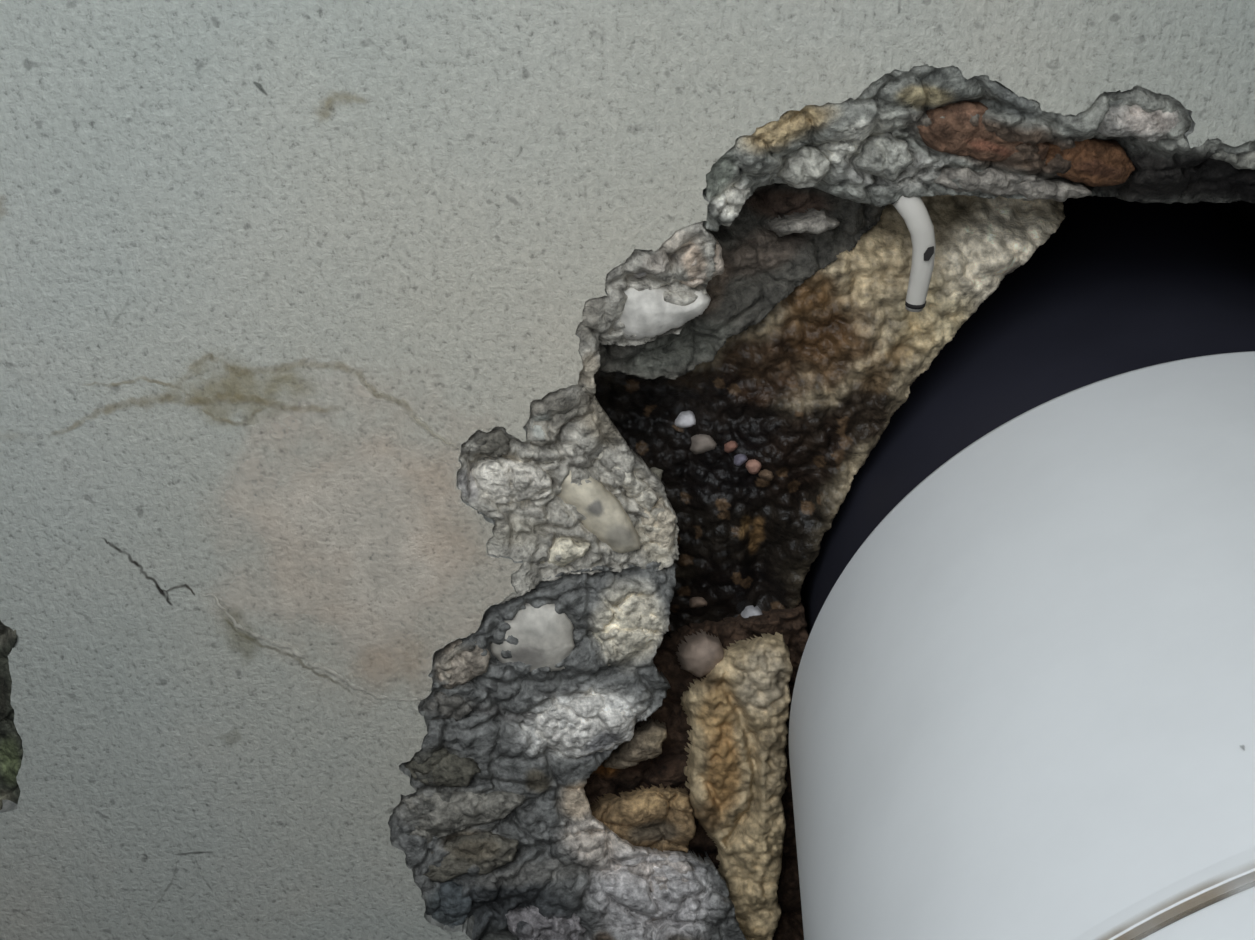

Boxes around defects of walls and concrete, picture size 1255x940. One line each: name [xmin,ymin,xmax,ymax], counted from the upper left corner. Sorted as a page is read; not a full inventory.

crack [104,539,195,603]
spalling [389,64,1255,940]
spalling [0,620,23,810]